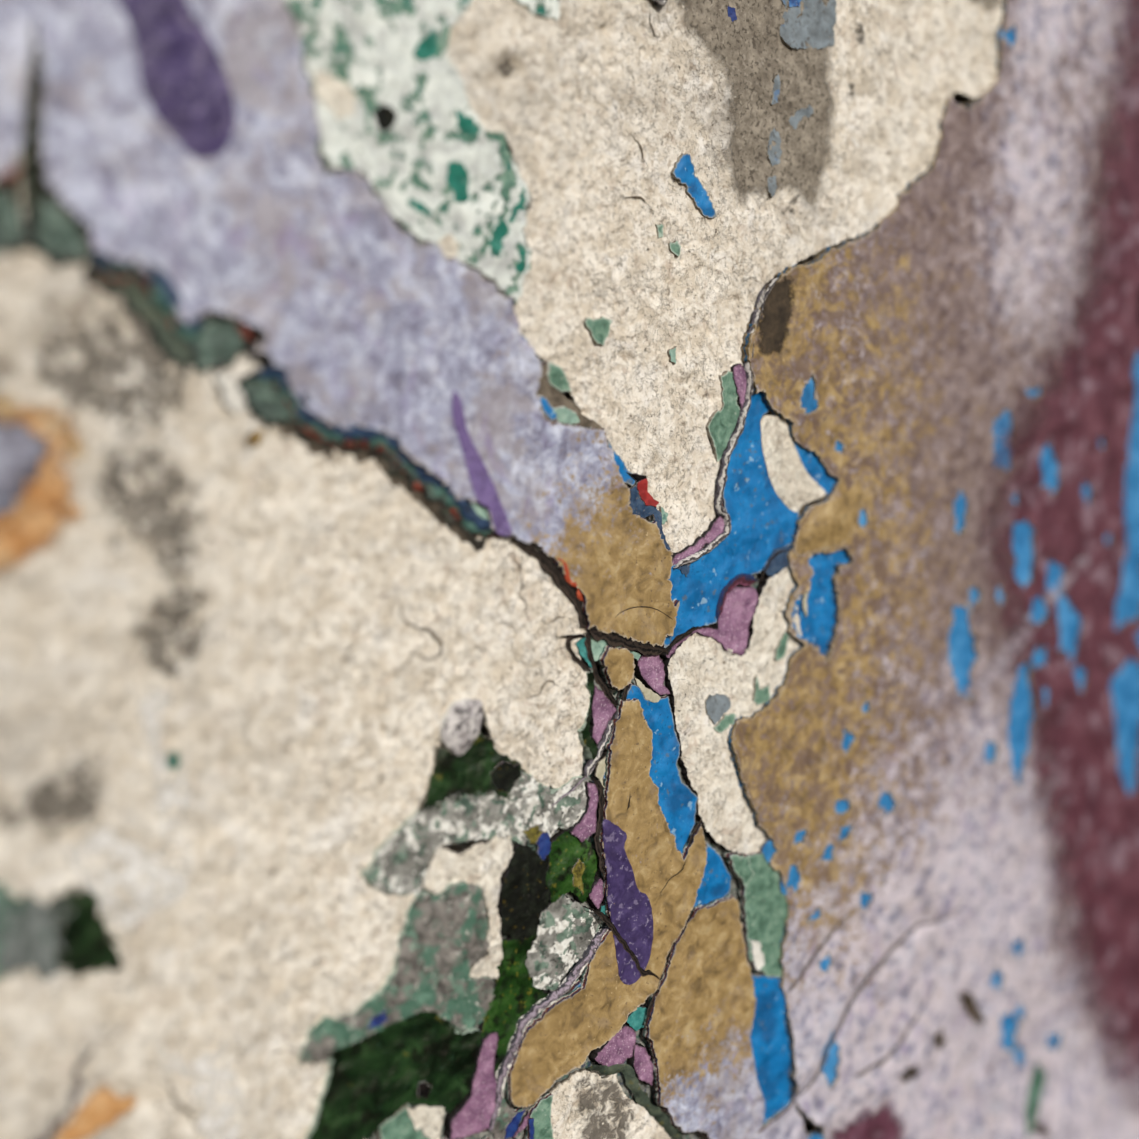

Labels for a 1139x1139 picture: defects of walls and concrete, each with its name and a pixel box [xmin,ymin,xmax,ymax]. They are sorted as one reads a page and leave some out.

crack [22,7,41,217]
flaking render [283,0,1016,577]
peeling [1114,351,1139,642]
crack [384,576,443,677]
flaking render [0,167,867,1139]
crack [508,538,714,707]
peeling [948,588,979,699]
peeling [984,560,1085,786]
peeling [1110,657,1139,795]
crack [589,775,695,1134]
crack [660,819,702,893]
crack [39,1014,130,1139]